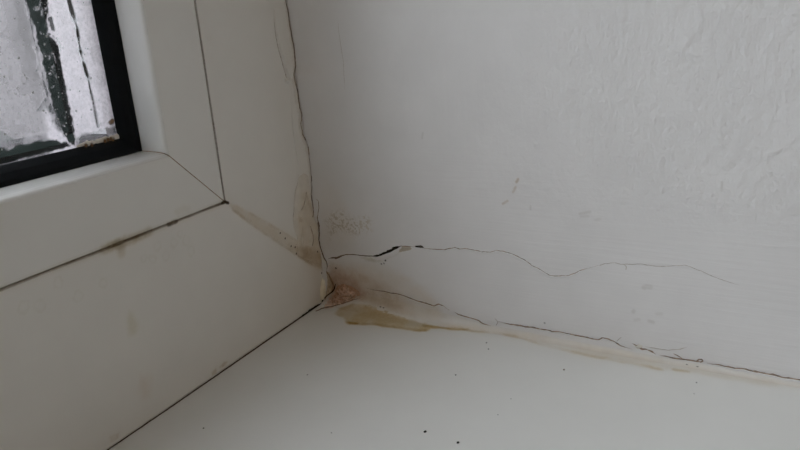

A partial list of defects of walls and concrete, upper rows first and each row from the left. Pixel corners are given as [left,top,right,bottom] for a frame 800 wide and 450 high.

crack [284,0,743,287]
crack [367,288,800,383]